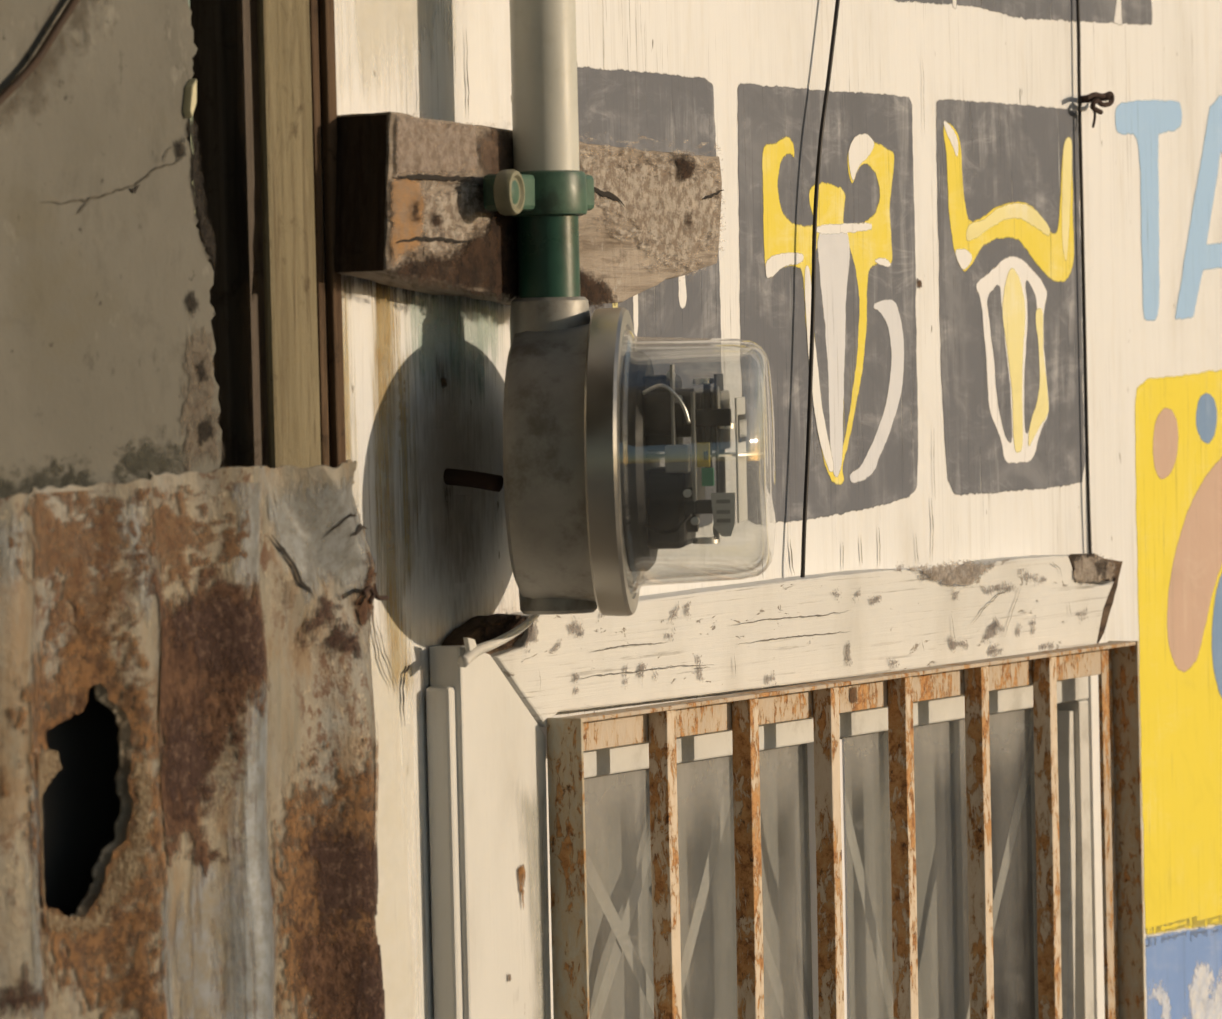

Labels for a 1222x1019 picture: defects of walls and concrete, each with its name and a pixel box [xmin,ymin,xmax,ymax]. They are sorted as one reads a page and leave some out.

crack [50,145,185,215]
spalling [176,78,216,268]
spalling [187,291,198,315]
spalling [181,328,224,471]
peeling [897,560,1014,599]
peeling [1074,555,1115,583]
peeling [526,619,539,652]
peeling [949,616,1054,656]
corrosion [0,485,271,1019]
corrosion [270,722,385,1019]
corrosion [518,864,526,907]